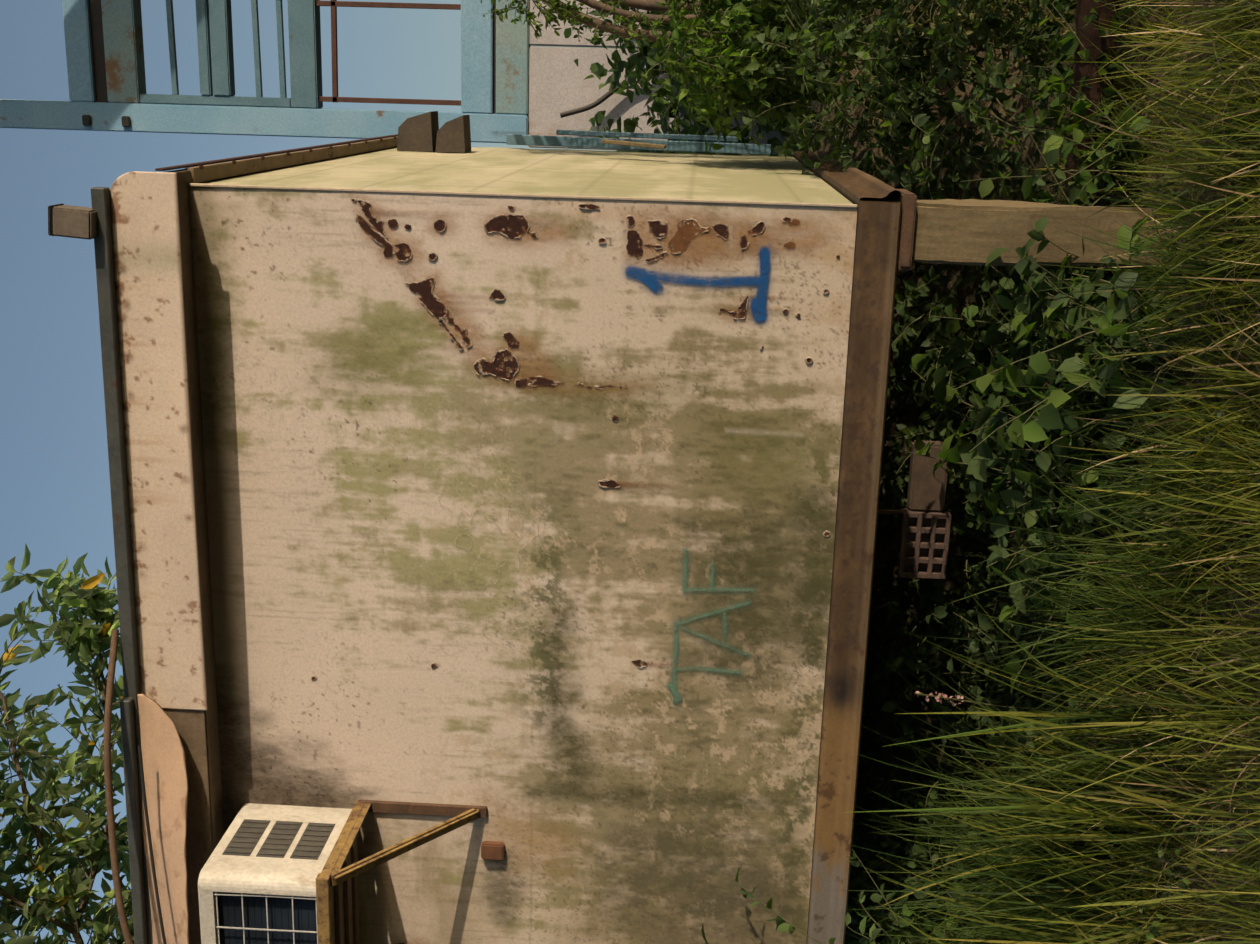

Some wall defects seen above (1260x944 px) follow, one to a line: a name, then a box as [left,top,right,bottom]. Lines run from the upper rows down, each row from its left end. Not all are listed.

peeling [351,198,413,263]
spalling [484,213,557,239]
spalling [626,215,671,263]
peeling [405,277,547,381]
spalling [719,296,749,320]
leakage [712,528,785,661]
leakage [625,841,783,933]